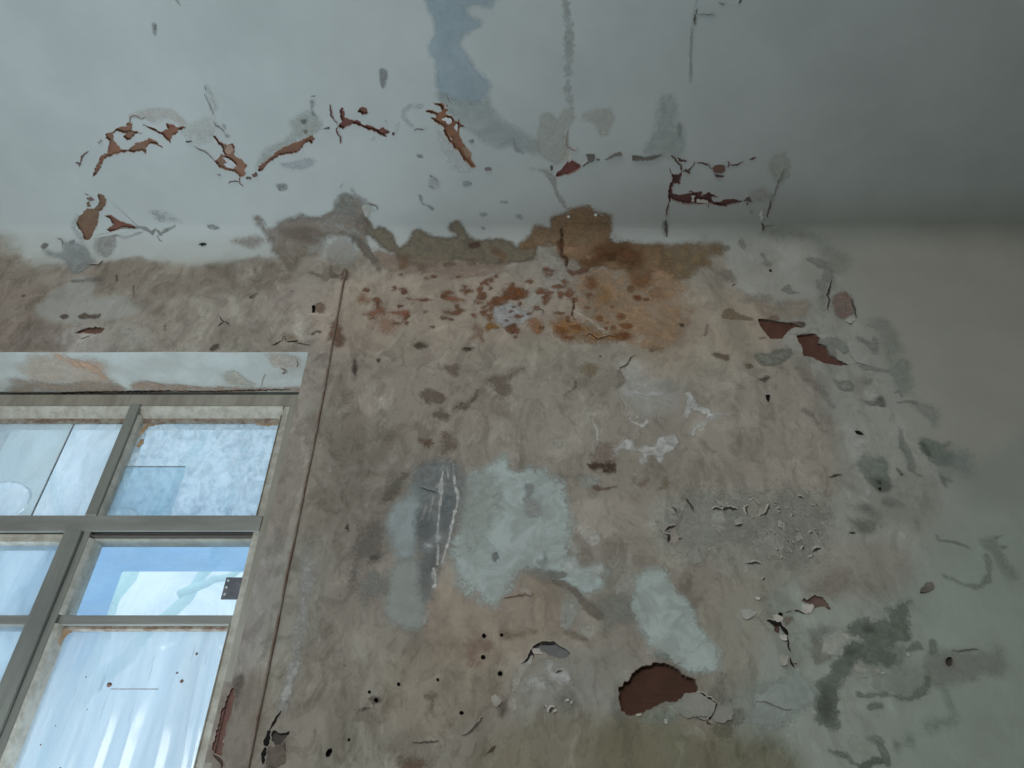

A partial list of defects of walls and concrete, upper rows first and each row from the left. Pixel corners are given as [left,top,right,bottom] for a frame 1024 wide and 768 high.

flaking render [75,104,394,187]
flaking render [402,96,491,171]
damp [427,0,573,207]
damp [40,234,116,282]
flaking render [73,193,175,241]
corrosion [356,274,429,331]
corrosion [429,205,722,348]
flaking render [668,168,753,213]
flaking render [758,316,884,382]
damp [383,388,479,624]
peeling [449,456,734,725]
damp [810,601,1000,729]